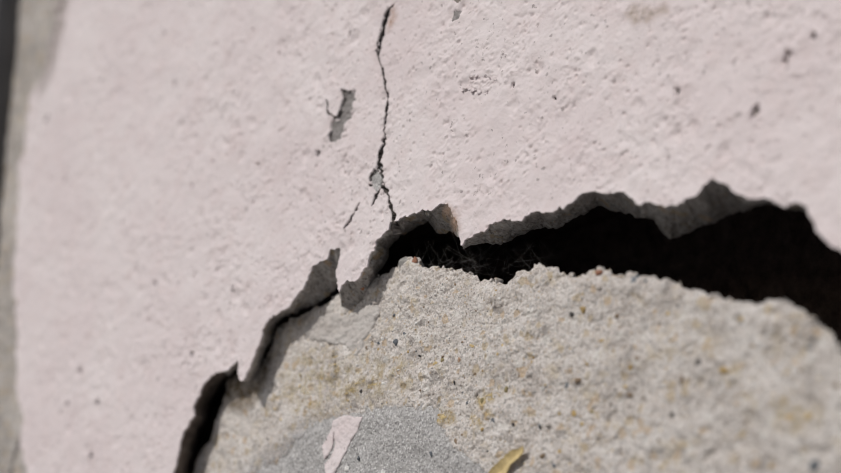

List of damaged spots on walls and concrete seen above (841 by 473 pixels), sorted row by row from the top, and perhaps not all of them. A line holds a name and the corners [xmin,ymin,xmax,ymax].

crack [344,5,841,353]
crack [189,369,238,473]
crack [259,285,340,370]
spalling [175,180,841,473]